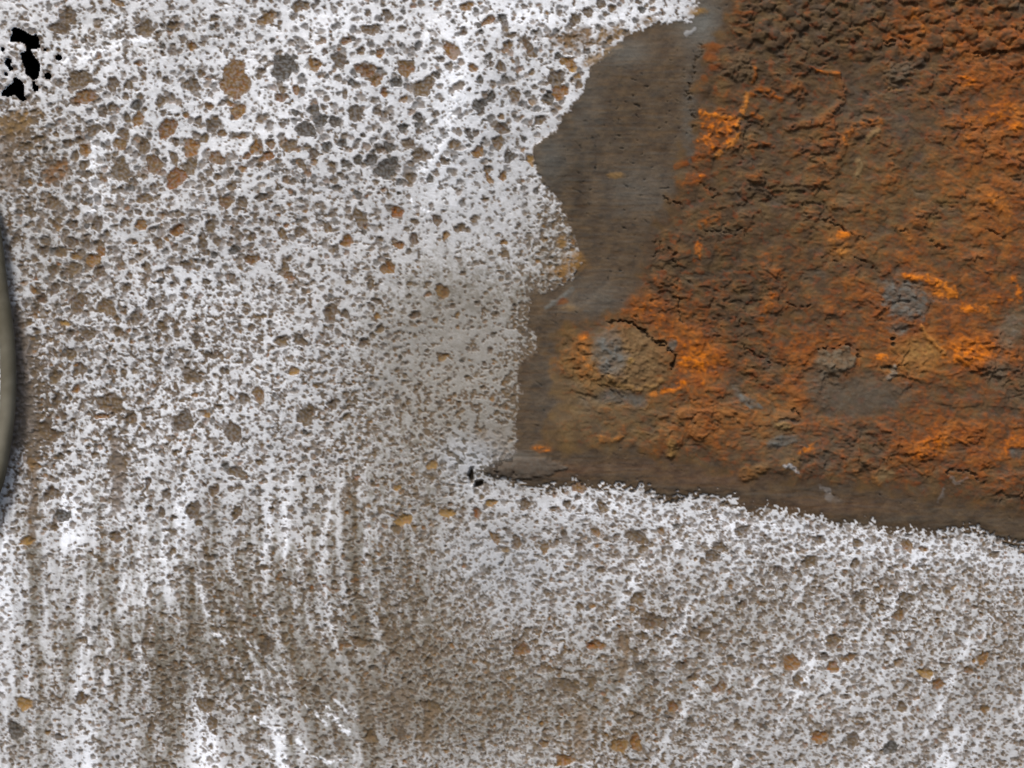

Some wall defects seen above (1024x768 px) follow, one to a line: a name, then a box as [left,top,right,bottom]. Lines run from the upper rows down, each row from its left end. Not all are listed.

spalling [568,0,607,28]
spalling [533,56,579,126]
crack [610,296,688,371]
corrosion [511,0,1024,554]
peeling [872,273,937,337]
peeling [982,303,1024,392]
peeling [731,344,921,450]
hole [472,498,524,551]
hole [519,497,532,512]
spalling [561,480,609,514]
hole [589,527,602,539]
peeling [846,462,898,488]